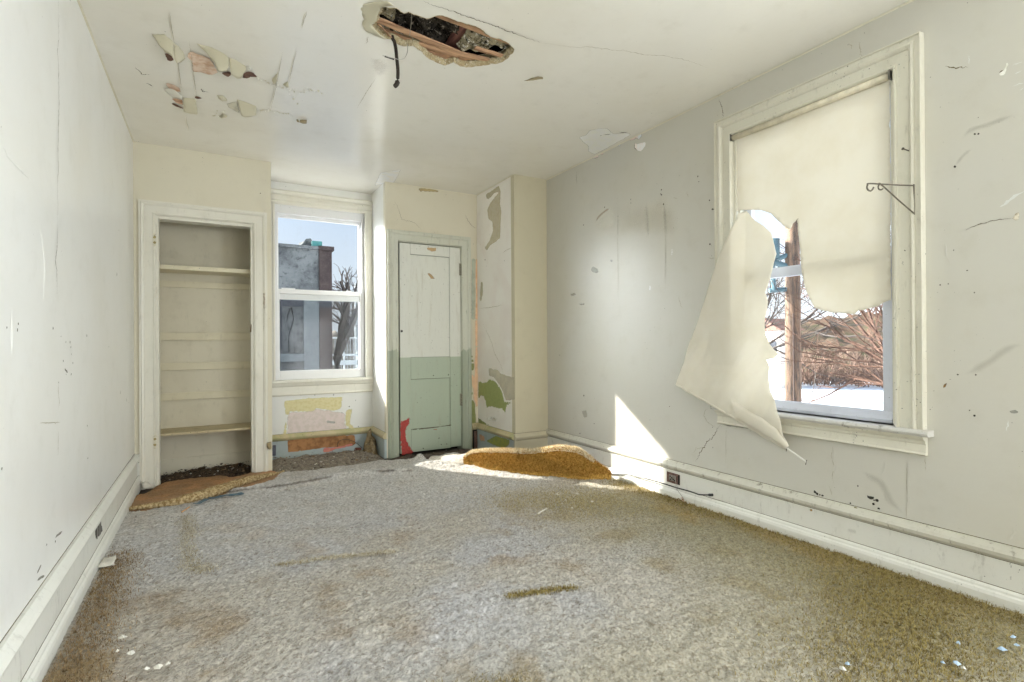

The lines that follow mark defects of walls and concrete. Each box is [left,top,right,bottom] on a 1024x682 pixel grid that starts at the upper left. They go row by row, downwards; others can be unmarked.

peeling [361,1,408,39]
peeling [152,34,326,100]
spalling [460,45,509,55]
peeling [164,83,205,114]
peeling [214,95,307,124]
peeling [485,186,501,250]
peeling [471,259,515,448]
peeling [283,397,361,452]
peeling [400,418,450,455]